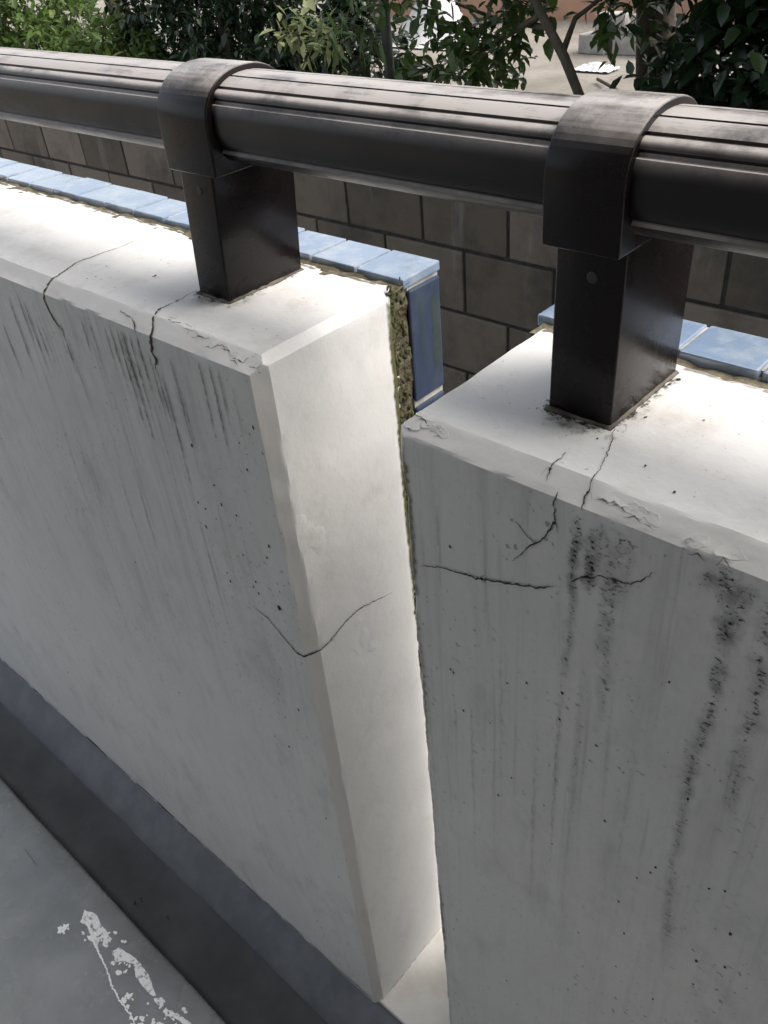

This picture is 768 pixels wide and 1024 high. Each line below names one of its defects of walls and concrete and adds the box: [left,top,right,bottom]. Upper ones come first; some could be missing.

crack [43,244,127,330]
crack [120,291,195,369]
peeling [168,317,263,373]
crack [581,429,615,509]
crack [426,452,652,589]
water stain [568,518,596,612]
peeling [595,490,661,529]
peeling [684,534,748,567]
crack [254,594,389,657]
water stain [685,571,755,795]